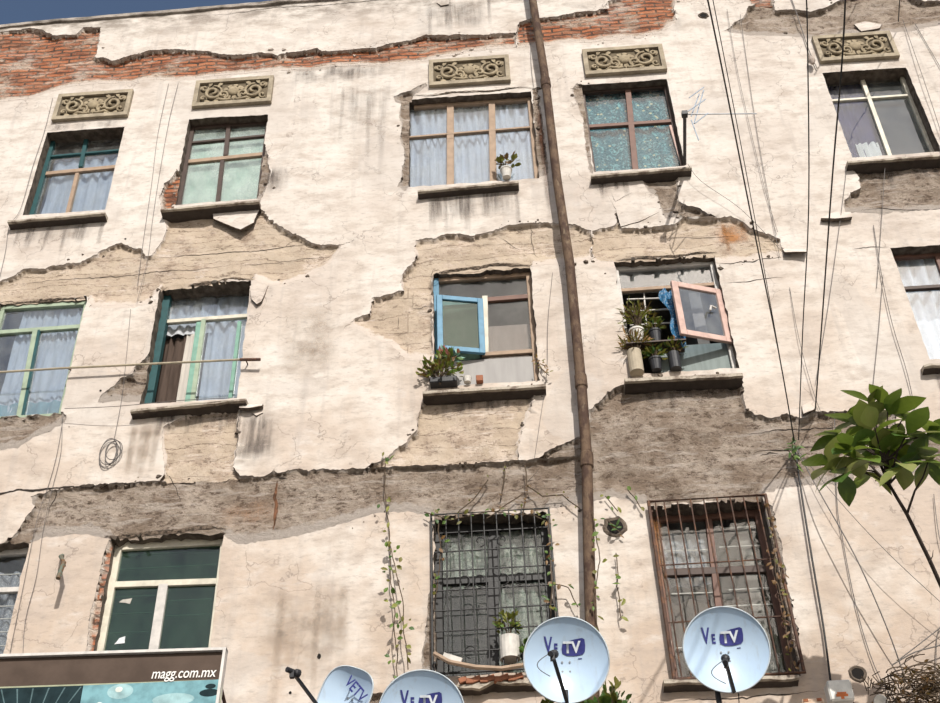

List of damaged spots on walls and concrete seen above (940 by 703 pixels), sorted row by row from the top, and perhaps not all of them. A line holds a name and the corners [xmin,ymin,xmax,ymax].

flaking render [0,0,704,103]
flaking render [725,0,940,39]
flaking render [0,147,350,310]
flaking render [344,178,806,374]
flaking render [98,355,152,404]
crack [0,482,140,508]
flaking render [0,382,856,676]